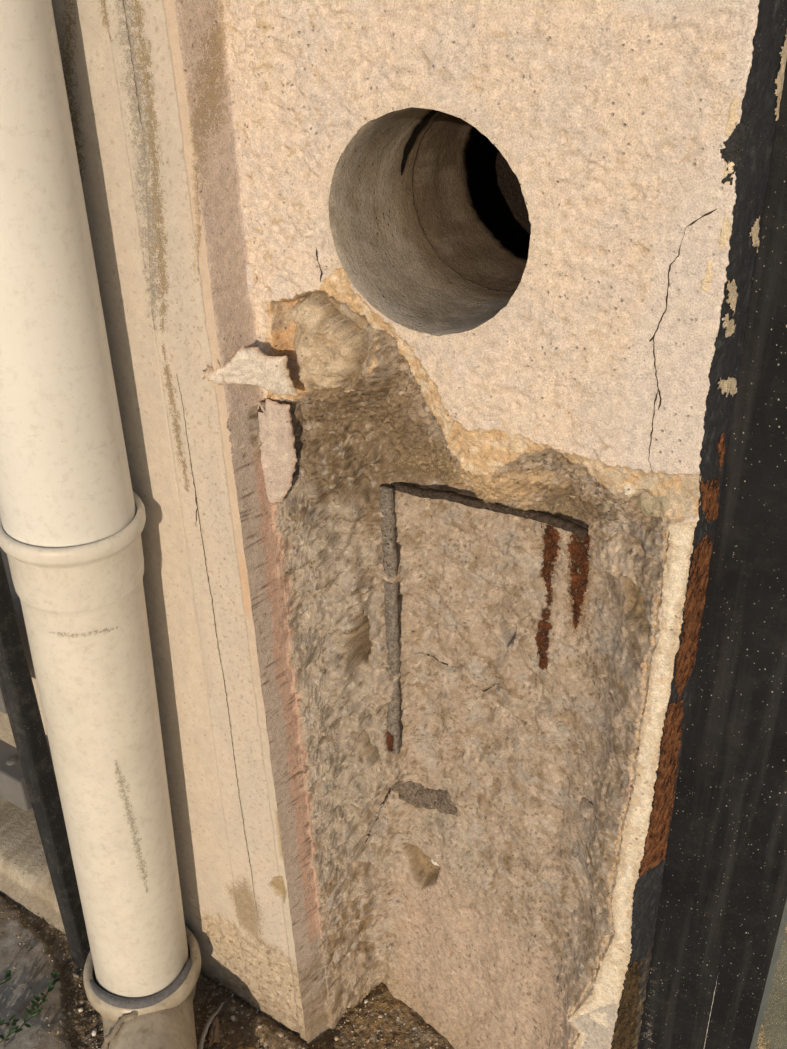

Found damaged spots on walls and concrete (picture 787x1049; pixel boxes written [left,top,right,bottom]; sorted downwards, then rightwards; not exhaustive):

crack [648,209,717,470]
spalling [199,268,701,1049]
corrosion [535,523,590,671]
corrosion [639,535,714,876]
corrosion [701,432,726,522]